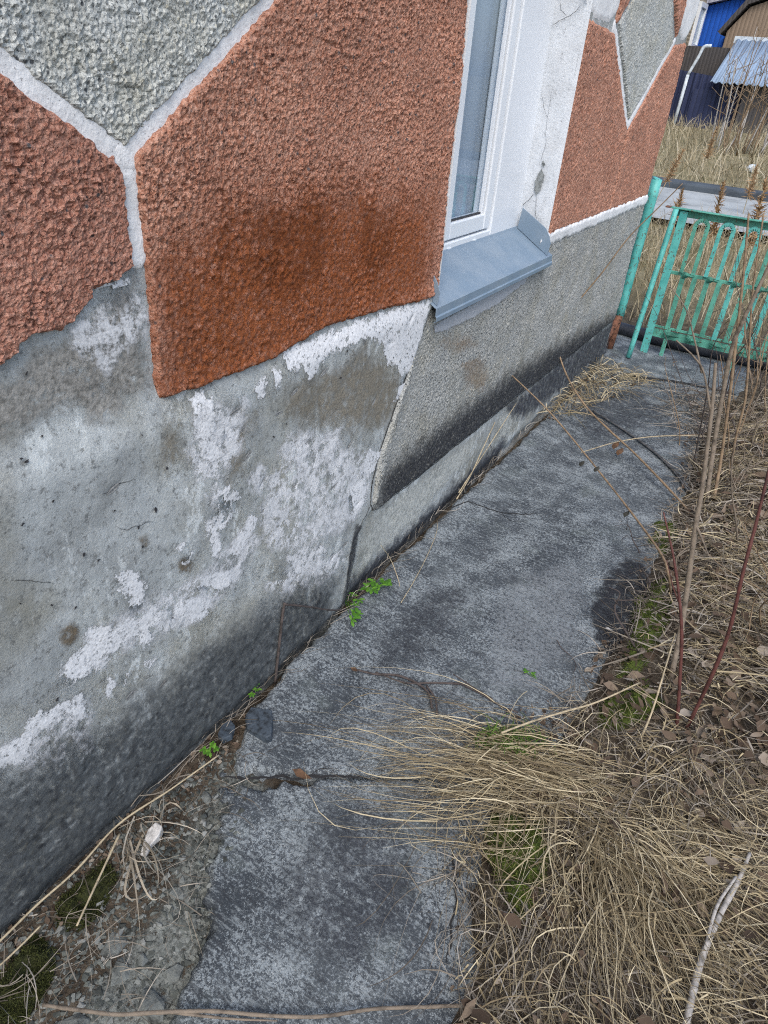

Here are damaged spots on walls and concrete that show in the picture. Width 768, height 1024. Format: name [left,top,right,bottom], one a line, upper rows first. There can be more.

flaking render [0,278,148,434]
peeling [188,299,430,471]
peeling [286,448,382,587]
water stain [0,316,614,940]
water stain [592,560,651,655]
crack [224,768,368,781]